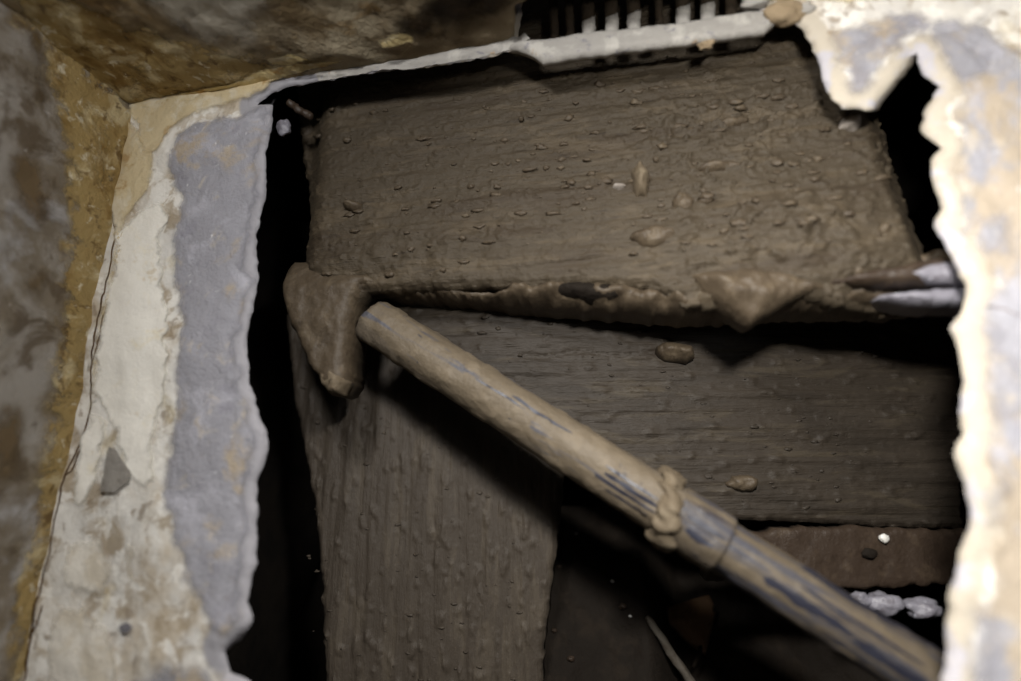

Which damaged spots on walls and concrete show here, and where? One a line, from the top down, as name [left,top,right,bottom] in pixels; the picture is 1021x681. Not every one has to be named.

spalling [315,33,530,81]
spalling [833,14,1021,681]
spalling [74,86,327,681]
spalling [562,476,610,506]
spalling [737,519,836,531]